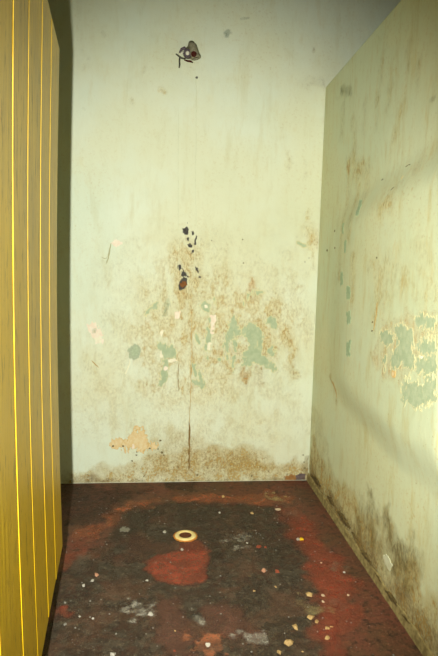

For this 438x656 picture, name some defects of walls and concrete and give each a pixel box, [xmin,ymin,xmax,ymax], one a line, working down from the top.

flaking render [178,265,189,291]
flaking render [125,344,141,374]
peeling [156,330,178,388]
peeling [194,300,279,374]
peeling [371,311,438,412]
peeling [109,425,165,462]
leakage [42,453,336,656]